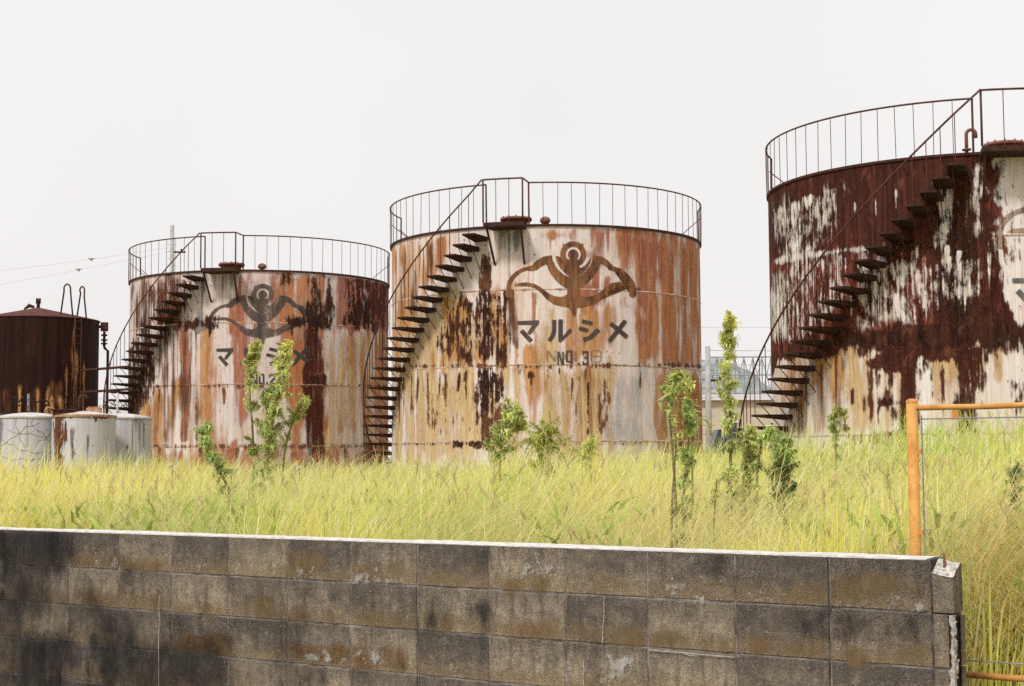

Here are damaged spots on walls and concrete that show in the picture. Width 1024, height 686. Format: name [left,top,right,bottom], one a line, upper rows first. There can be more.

rust [34,228,703,476]
peeling [770,189,991,342]
rust [768,155,1024,446]
leakage [0,531,97,686]
leakage [86,591,229,686]
leakage [600,629,640,683]